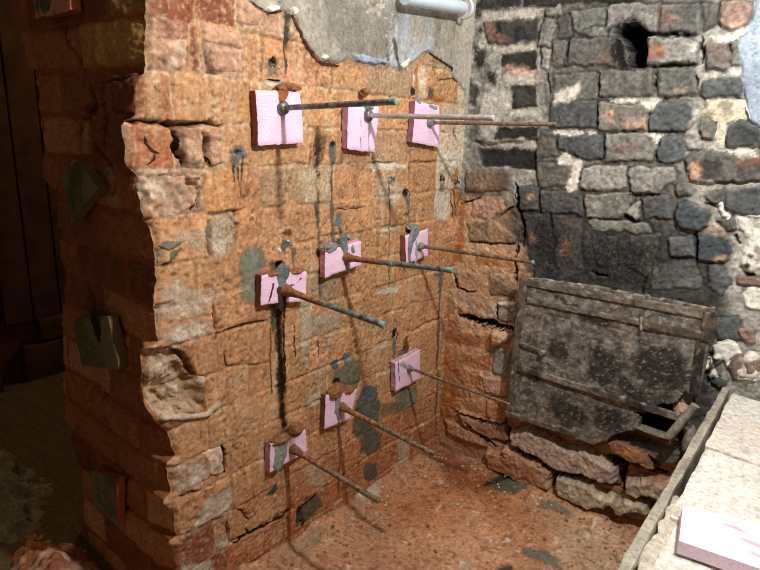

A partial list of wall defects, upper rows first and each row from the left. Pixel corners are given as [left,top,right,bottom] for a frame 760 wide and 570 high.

spalling [144,38,188,71]
peeling [200,0,477,105]
spalling [135,125,222,220]
crack [464,304,514,331]
spalling [139,346,222,421]
leakage [269,303,287,427]
crack [225,508,291,543]